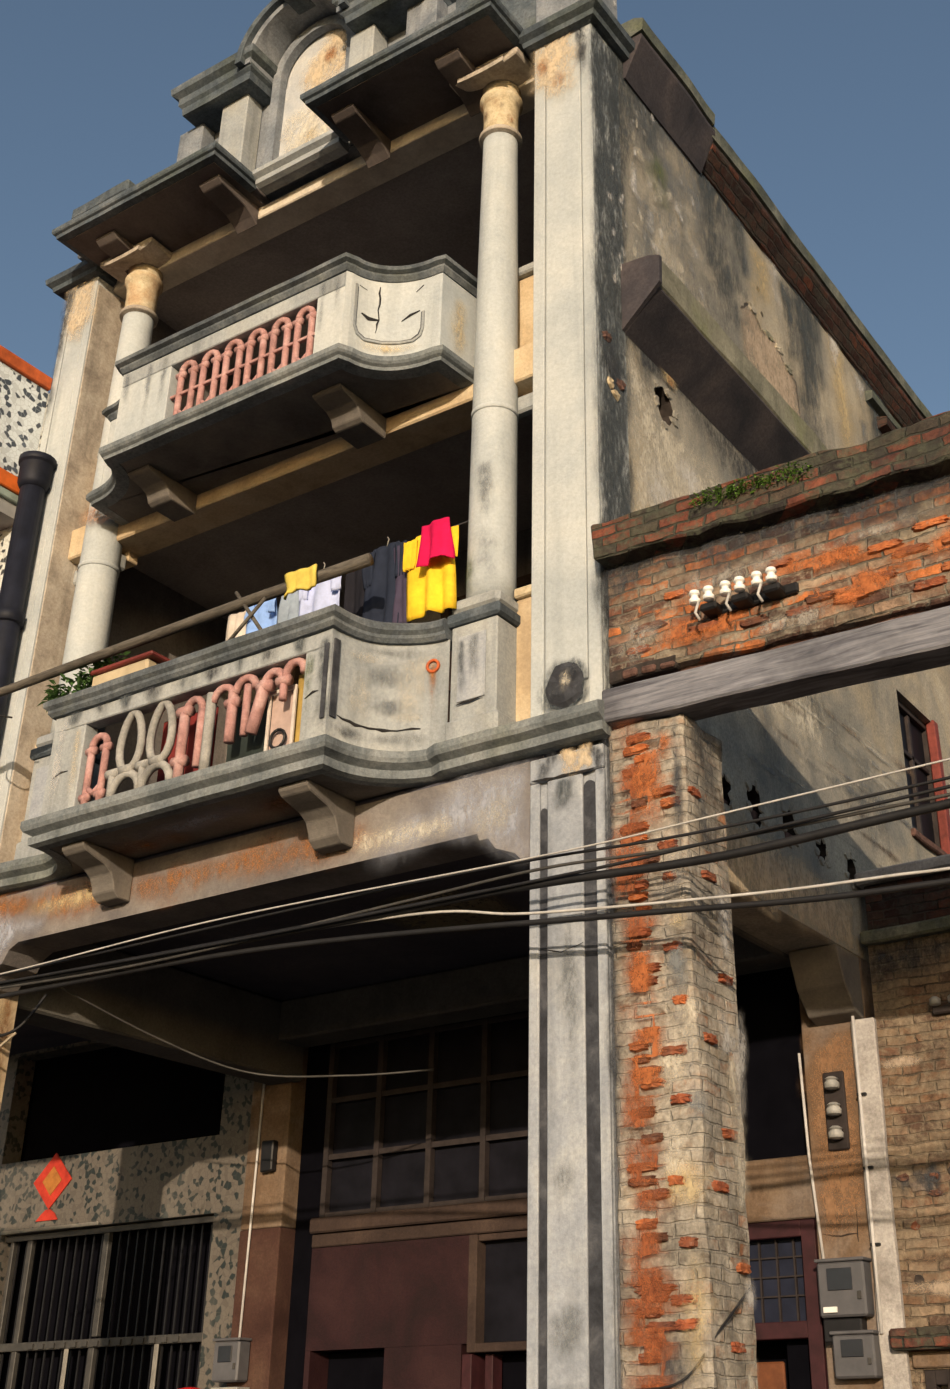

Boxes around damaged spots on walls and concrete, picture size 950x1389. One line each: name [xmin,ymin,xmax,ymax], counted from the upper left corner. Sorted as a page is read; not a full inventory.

crack [360,285,424,333]
flaking render [602,331,715,510]
water stain [591,25,883,523]
peeling [740,286,801,417]
flaking render [609,512,950,687]
peeling [531,742,603,782]
flaking render [774,694,821,749]
flaking render [701,769,861,948]
flaking render [615,732,747,1389]
flaking render [736,1262,753,1303]